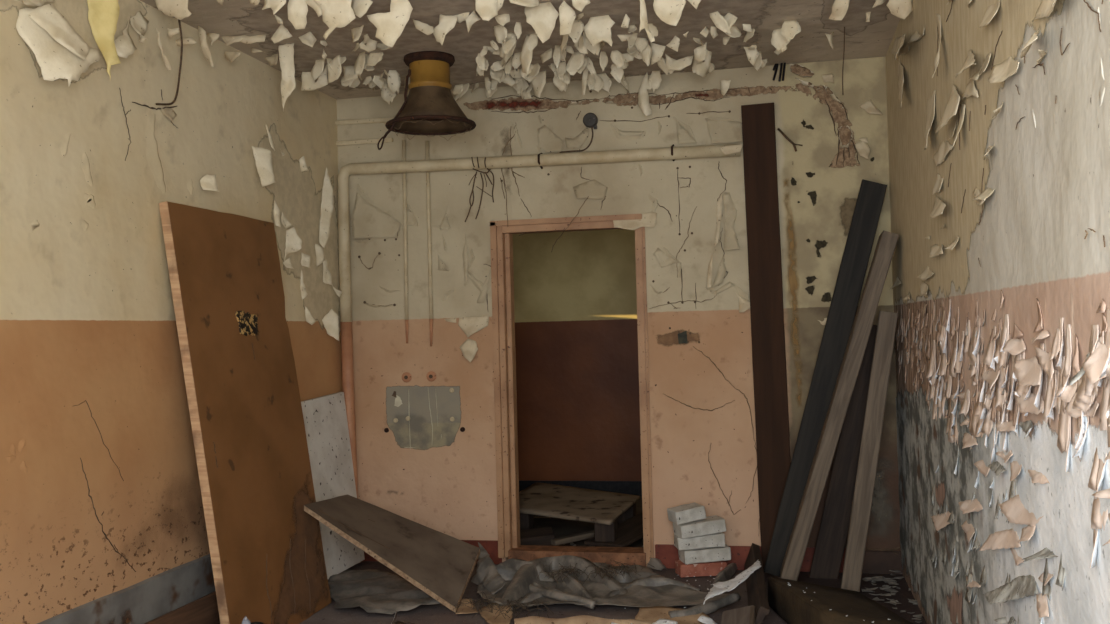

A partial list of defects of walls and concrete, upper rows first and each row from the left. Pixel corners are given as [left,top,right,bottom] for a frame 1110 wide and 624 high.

peeling [0,0,870,168]
peeling [200,174,219,192]
peeling [252,123,342,341]
peeling [352,183,451,271]
peeling [442,235,491,362]
peeling [613,171,691,233]
peeling [653,164,750,312]
peeling [820,0,1110,624]
crack [74,400,136,572]